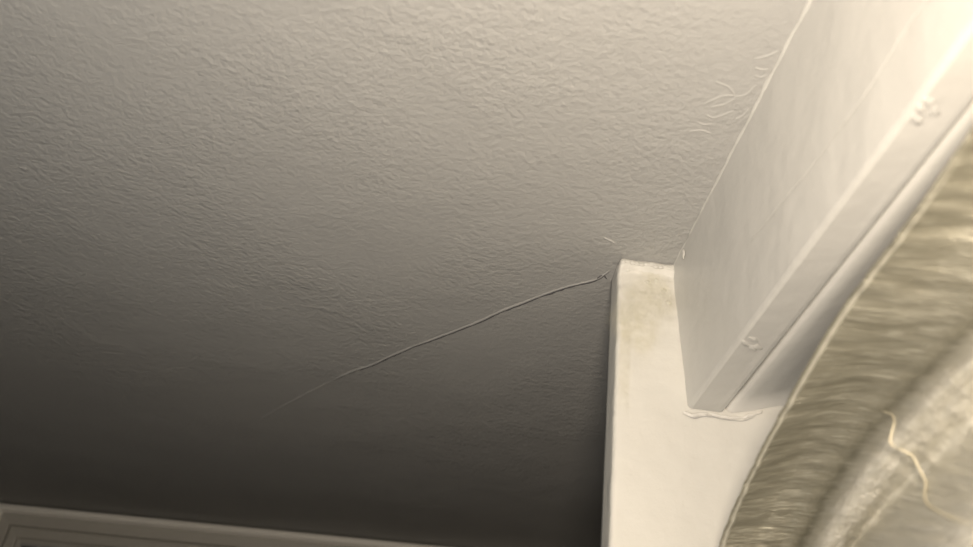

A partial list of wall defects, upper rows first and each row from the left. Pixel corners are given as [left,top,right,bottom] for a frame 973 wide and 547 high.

crack [259,270,611,421]